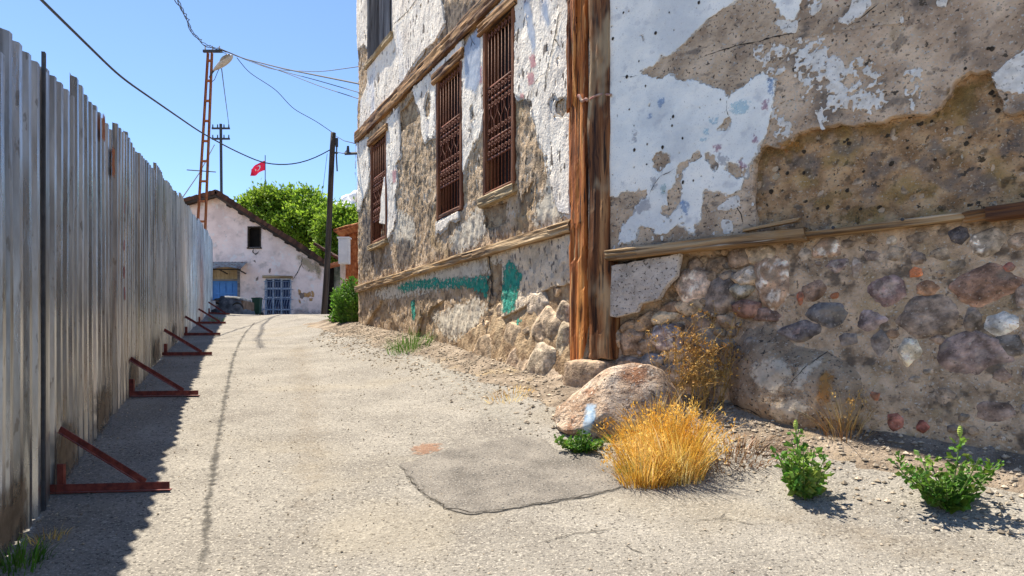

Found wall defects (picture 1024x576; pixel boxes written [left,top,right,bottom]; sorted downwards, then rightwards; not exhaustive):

crack [700,33,795,58]
spalling [393,85,435,141]
spalling [610,0,1024,249]
peeling [379,177,415,266]
peeling [524,161,568,229]